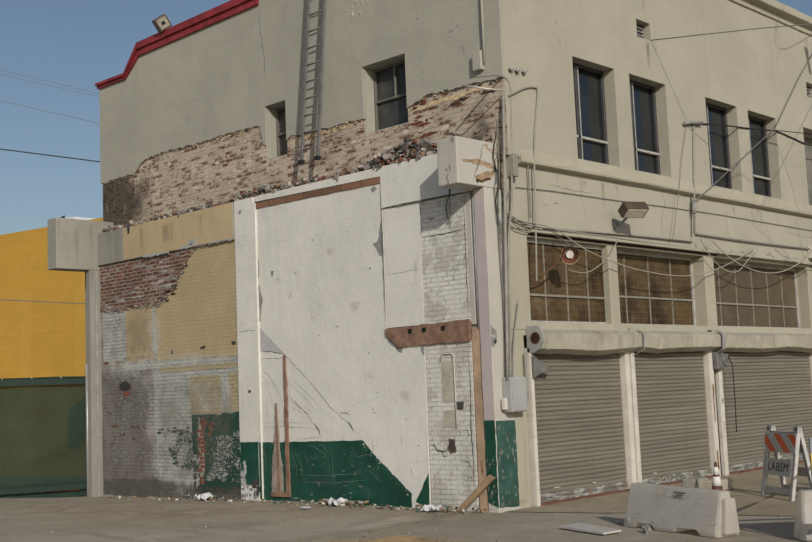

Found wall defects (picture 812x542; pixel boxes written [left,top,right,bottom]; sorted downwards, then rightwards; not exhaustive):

spalling [103,77,504,234]
spalling [100,238,198,314]
spalling [373,222,384,257]
spalling [157,418,260,500]